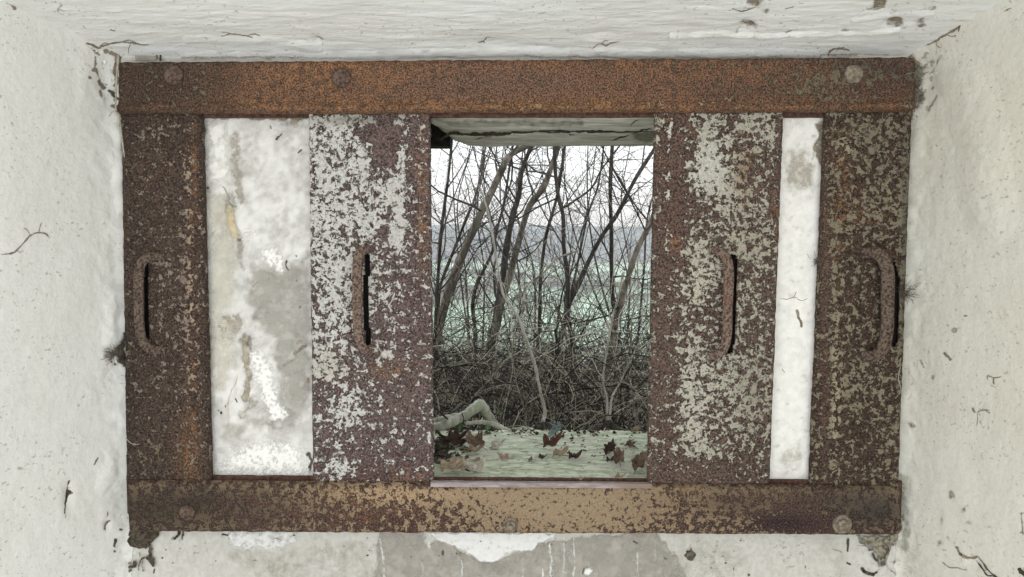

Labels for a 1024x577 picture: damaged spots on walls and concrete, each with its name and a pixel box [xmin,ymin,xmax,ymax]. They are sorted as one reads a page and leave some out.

damp [208,123,244,203]
damp [210,196,311,421]
damp [218,439,311,475]